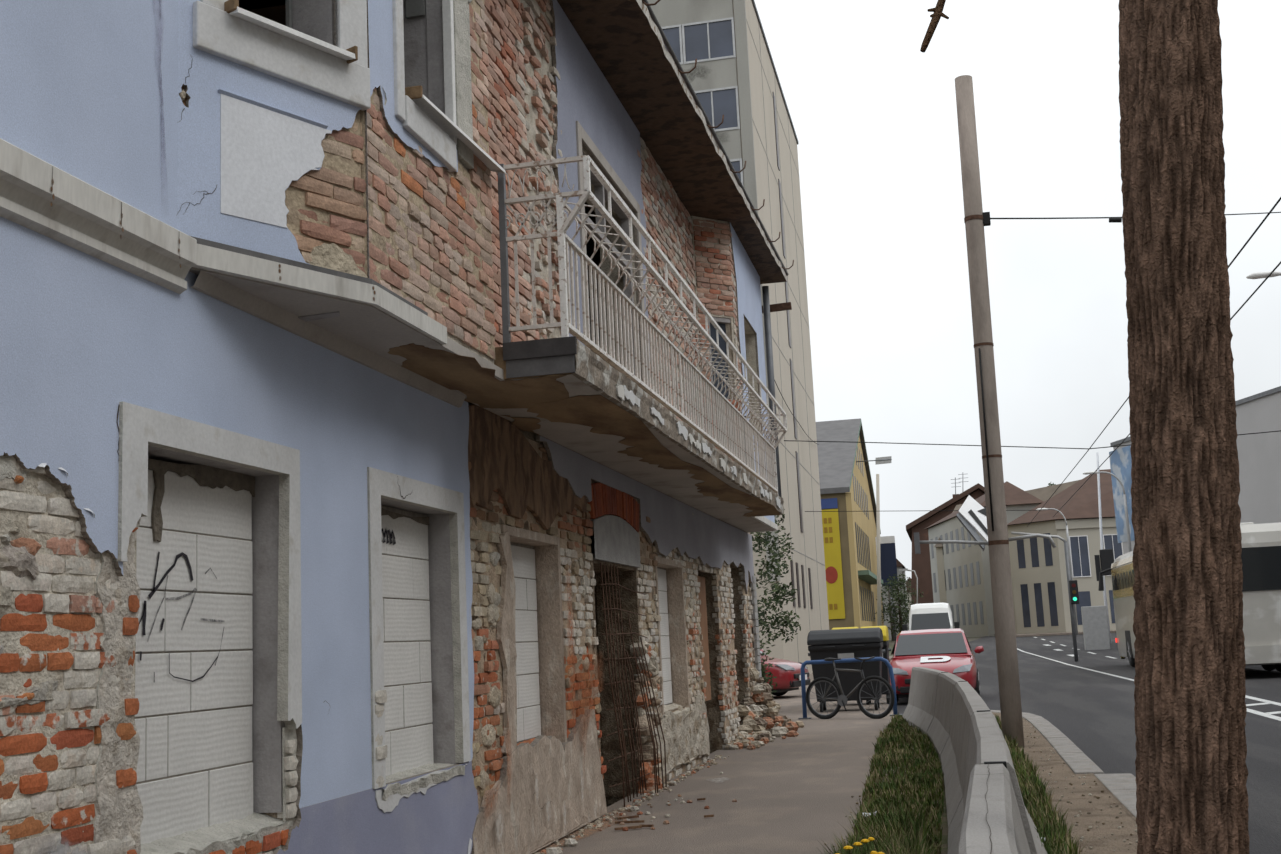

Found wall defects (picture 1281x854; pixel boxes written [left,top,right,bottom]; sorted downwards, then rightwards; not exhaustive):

spalling [285,0,781,854]
spalling [0,455,143,854]
spalling [184,727,298,854]